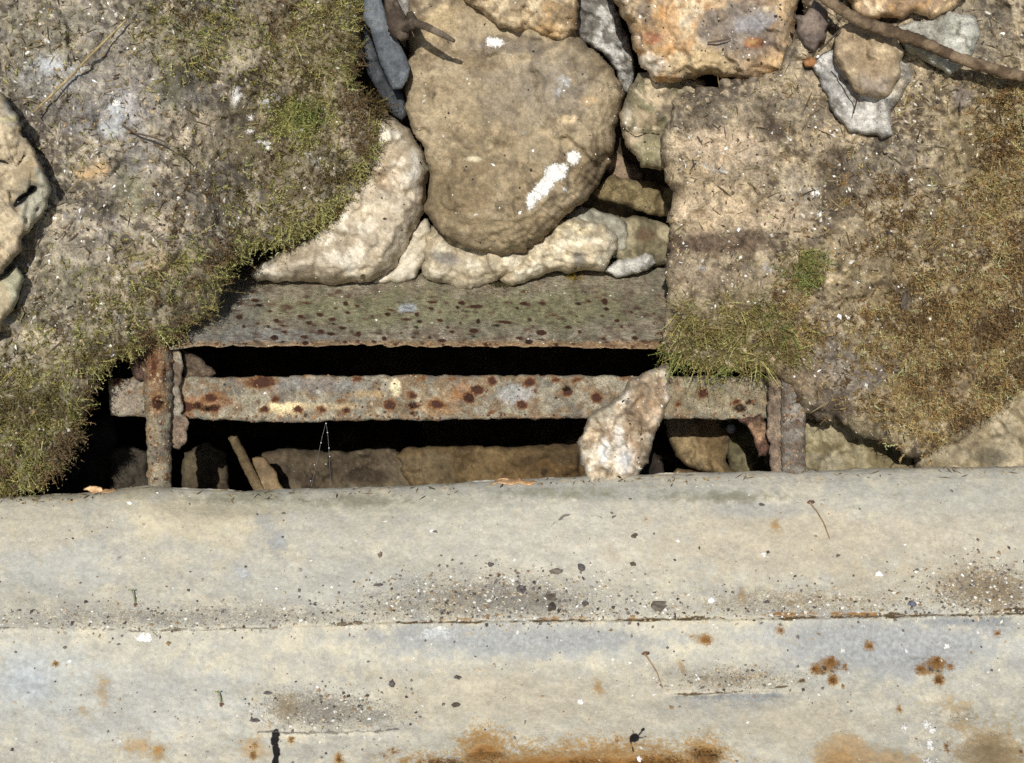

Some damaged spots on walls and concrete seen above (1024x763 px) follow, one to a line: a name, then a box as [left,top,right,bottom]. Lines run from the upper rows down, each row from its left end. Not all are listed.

rust [236,298,663,349]
rust [109,340,633,485]
rust [729,386,811,472]
rust [810,655,847,685]
rust [914,656,954,687]
rust [364,717,757,763]